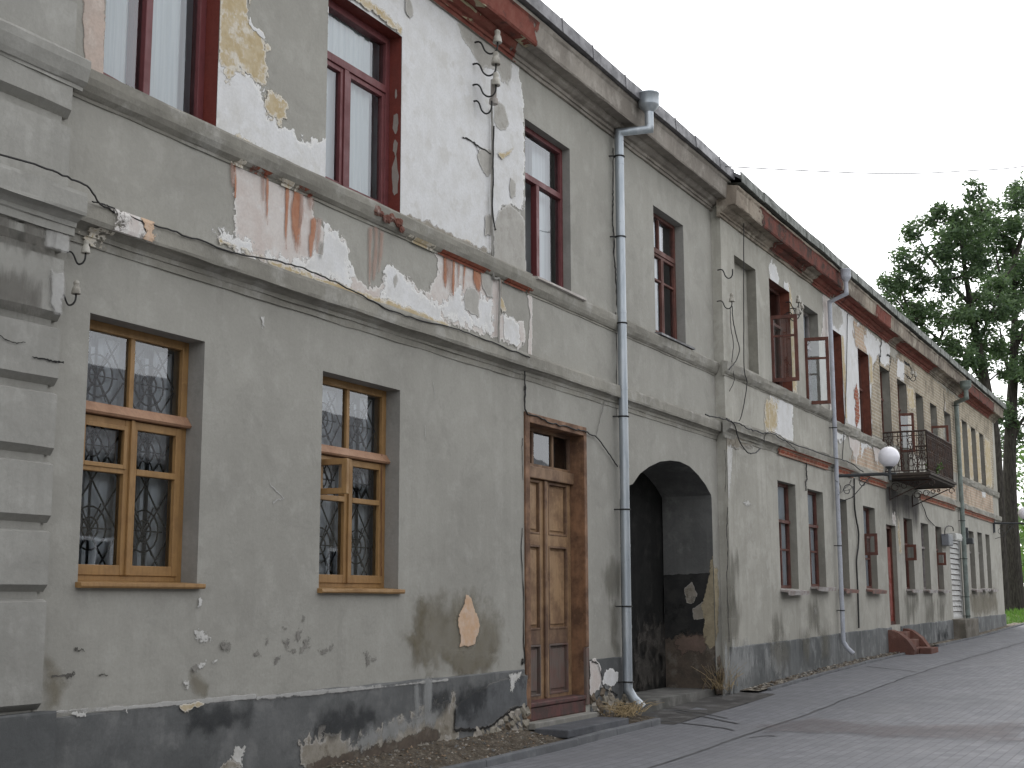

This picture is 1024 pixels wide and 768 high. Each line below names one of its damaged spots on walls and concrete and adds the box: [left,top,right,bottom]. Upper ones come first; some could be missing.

peeling [212,0,540,355]
peeling [79,206,157,249]
corrosion [285,188,321,257]
spalling [759,206,995,523]
spalling [274,616,334,665]
peeling [458,595,480,647]
leakage [633,624,666,691]
spalling [56,628,531,768]
leakage [316,709,375,735]
leakage [415,679,449,715]
peeling [590,658,633,715]